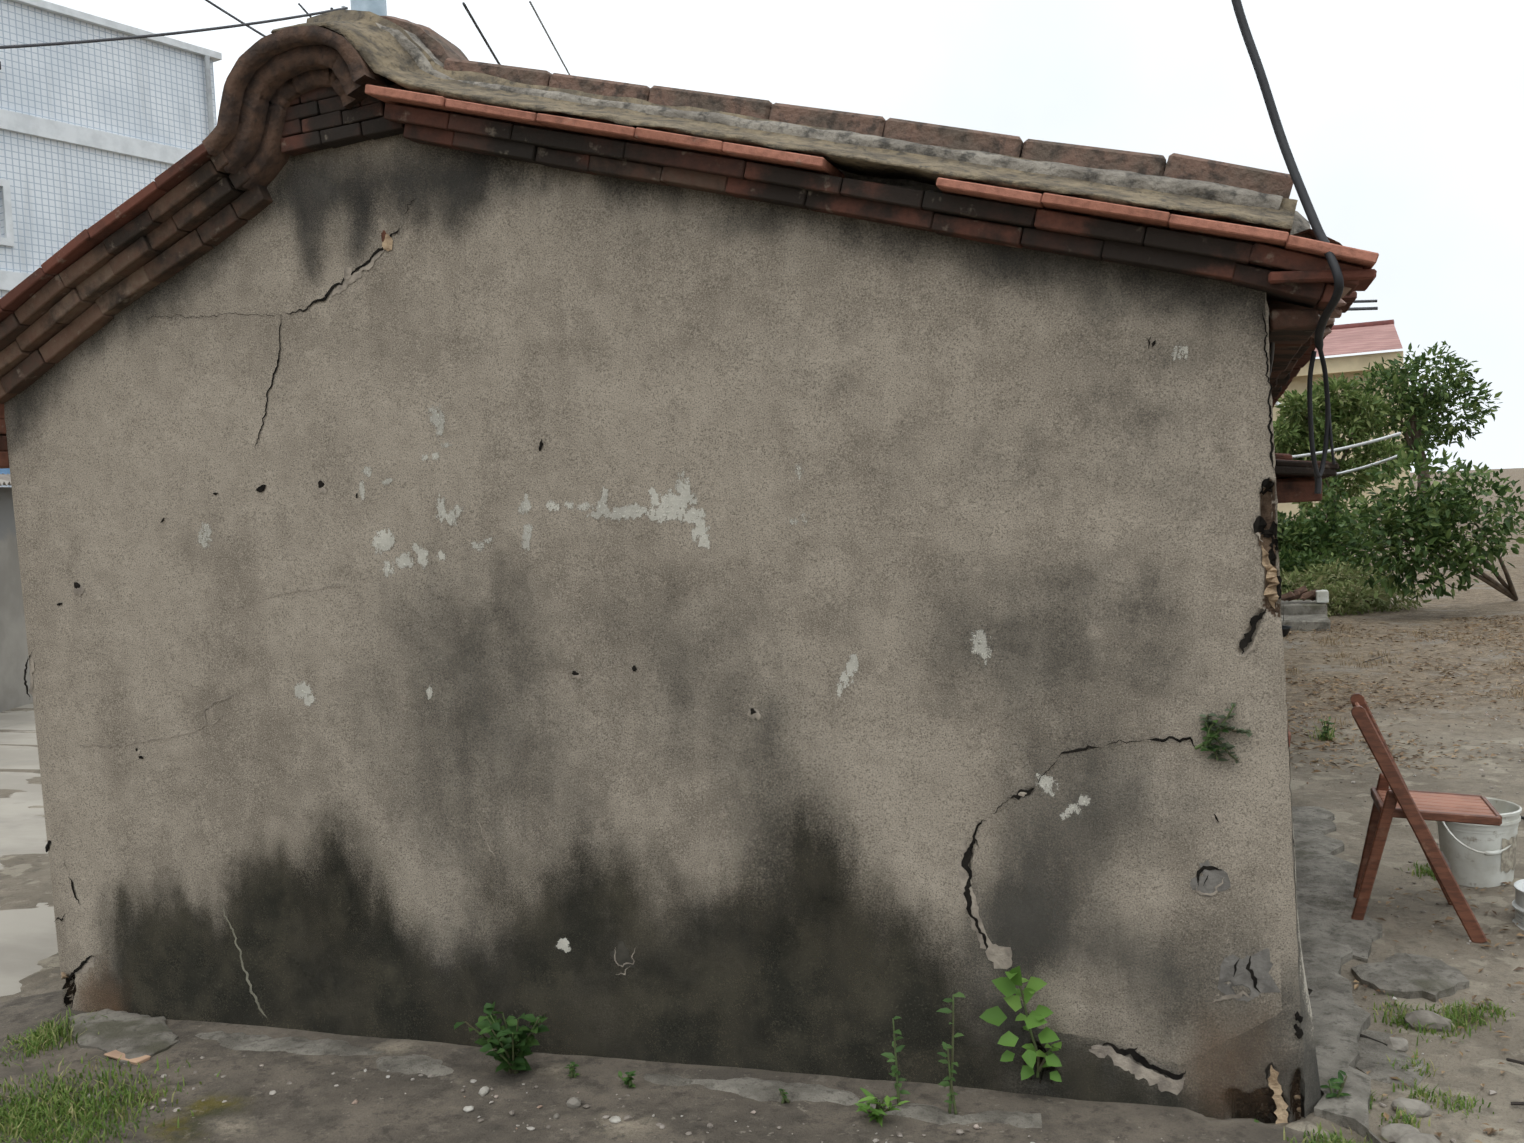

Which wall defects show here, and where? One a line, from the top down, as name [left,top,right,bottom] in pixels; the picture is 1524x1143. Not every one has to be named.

crack [147,198,416,448]
crack [1262,312,1275,470]
peeling [518,471,711,552]
spalling [1238,477,1282,657]
crack [54,863,81,922]
crack [66,956,97,1007]
water stain [112,752,1141,1095]
crack [958,736,1195,969]
water stain [1061,1046,1228,1119]
spalling [1226,1062,1304,1124]